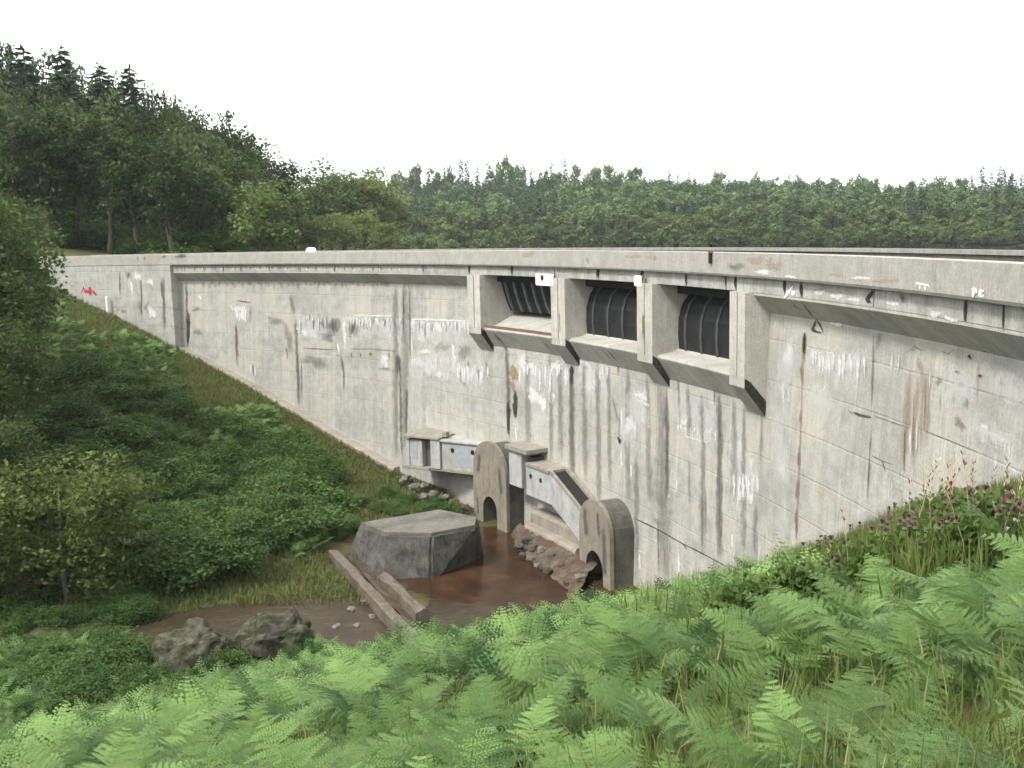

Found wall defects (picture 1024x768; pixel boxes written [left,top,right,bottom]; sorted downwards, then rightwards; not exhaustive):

leakage [295,291,489,449]
leakage [617,391,649,477]
leakage [665,384,759,552]
corrosion [796,332,806,497]
corrosion [903,378,929,463]